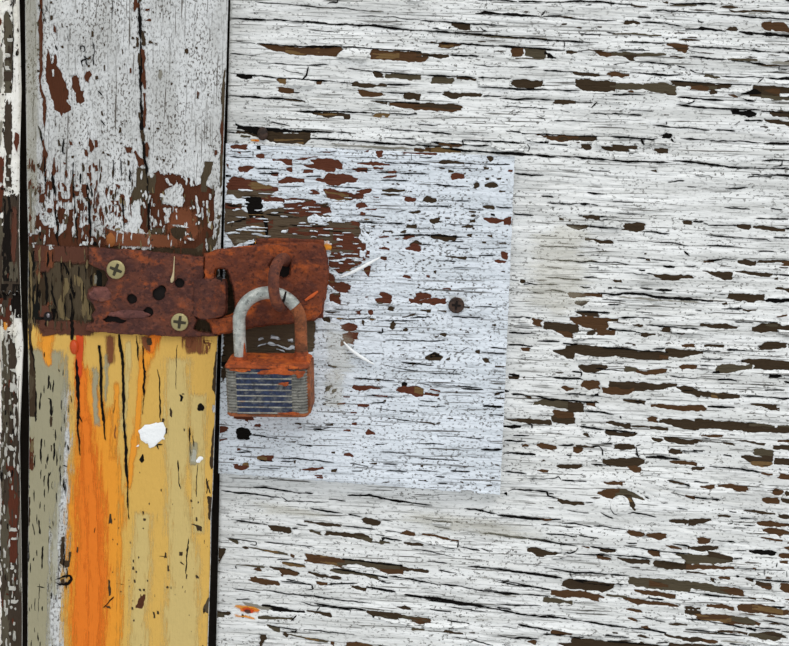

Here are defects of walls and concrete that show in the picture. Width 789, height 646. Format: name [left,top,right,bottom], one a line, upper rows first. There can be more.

crack [2,0,16,91]
peeling [436,23,556,60]
peeling [588,20,700,61]
peeling [727,54,789,67]
peeling [559,215,646,244]
peeling [737,224,785,232]
corrosion [34,245,89,277]
corrosion [89,287,111,302]
peeling [0,0,511,646]
crack [98,334,177,518]
peeling [497,280,789,646]
crack [0,343,82,646]